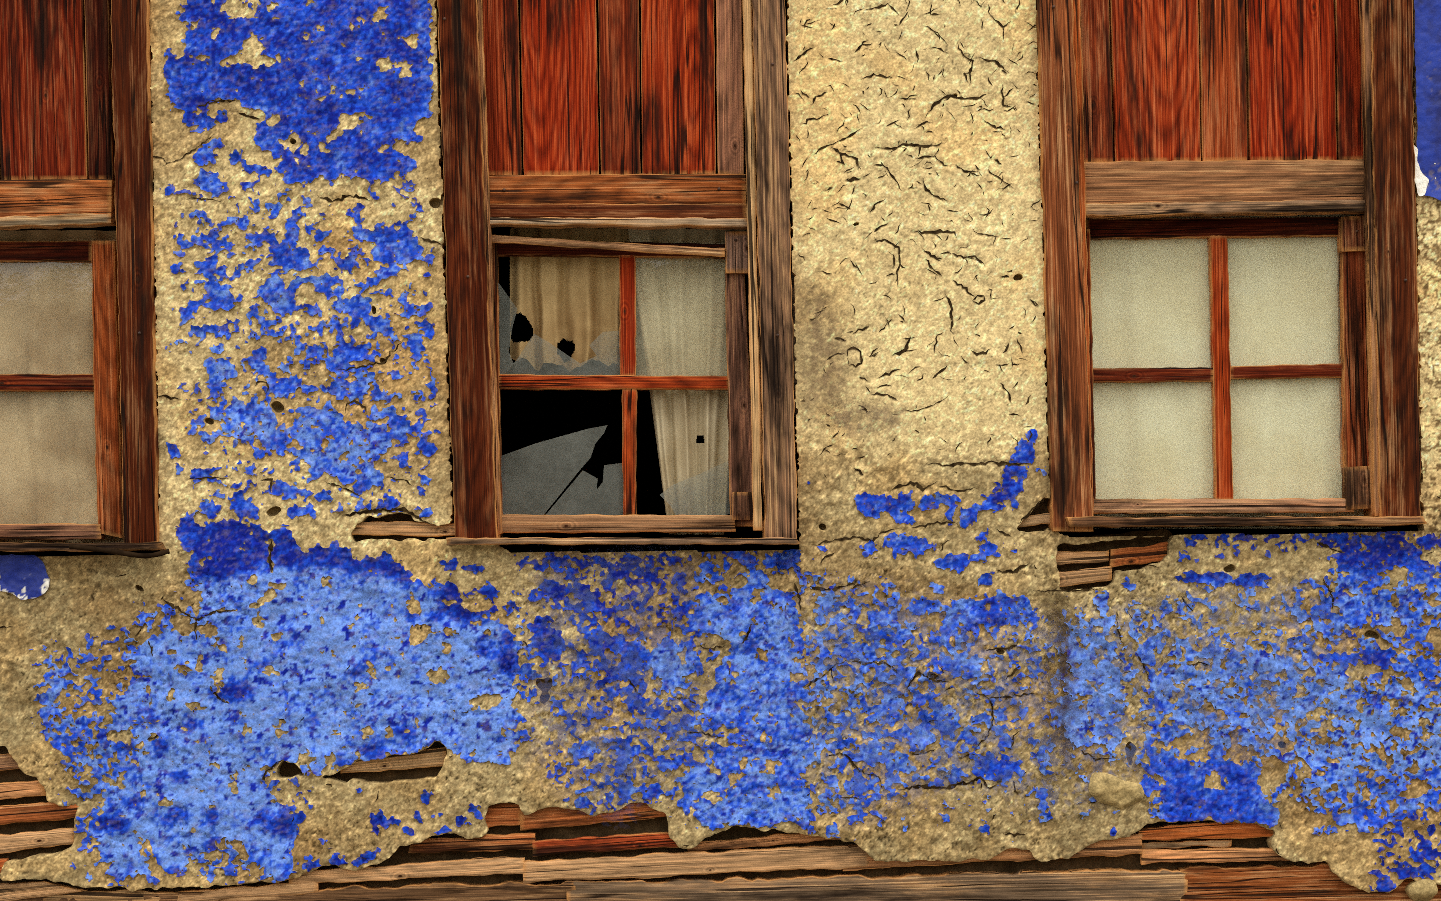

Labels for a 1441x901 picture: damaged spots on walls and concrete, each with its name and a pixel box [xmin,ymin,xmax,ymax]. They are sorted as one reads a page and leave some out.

peeling [160,0,455,542]
peeling [0,480,1441,901]
crack [794,0,1040,610]
crack [806,628,1034,837]
peeling [854,429,1047,575]
crack [997,497,1152,684]